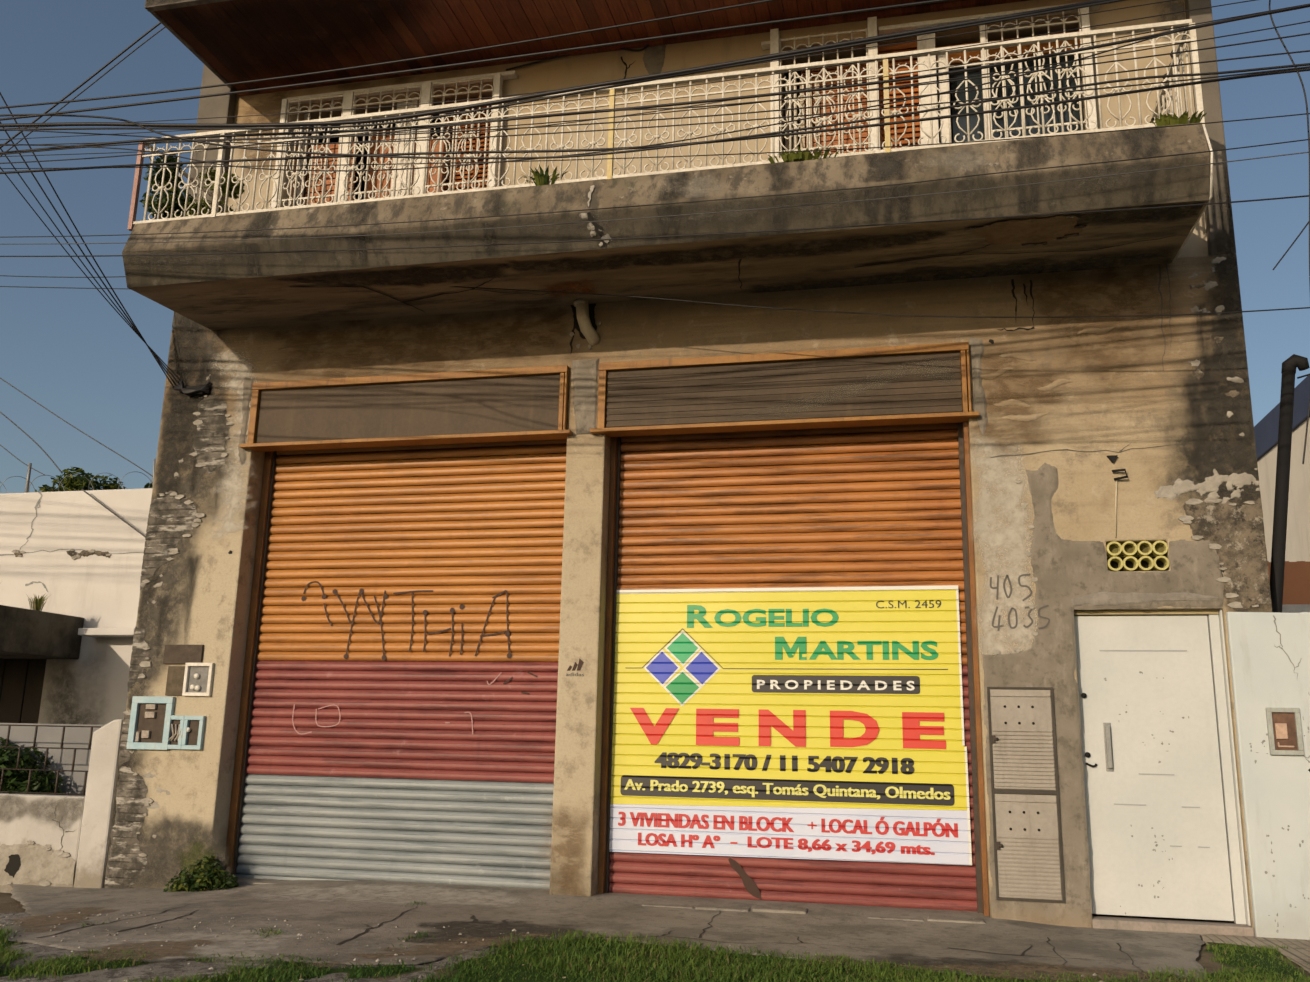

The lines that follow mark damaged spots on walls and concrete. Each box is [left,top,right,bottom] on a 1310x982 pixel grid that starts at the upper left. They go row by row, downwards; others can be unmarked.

damp [280,151,945,286]
damp [1013,139,1044,212]
damp [1067,128,1261,507]
crack [0,491,143,592]
spalling [140,374,234,604]
damp [129,316,252,707]
peeling [975,441,1038,655]
spalling [1154,468,1272,610]
spalling [128,627,151,692]
crack [1273,615,1301,680]
damp [109,749,140,852]
spalling [104,710,170,888]